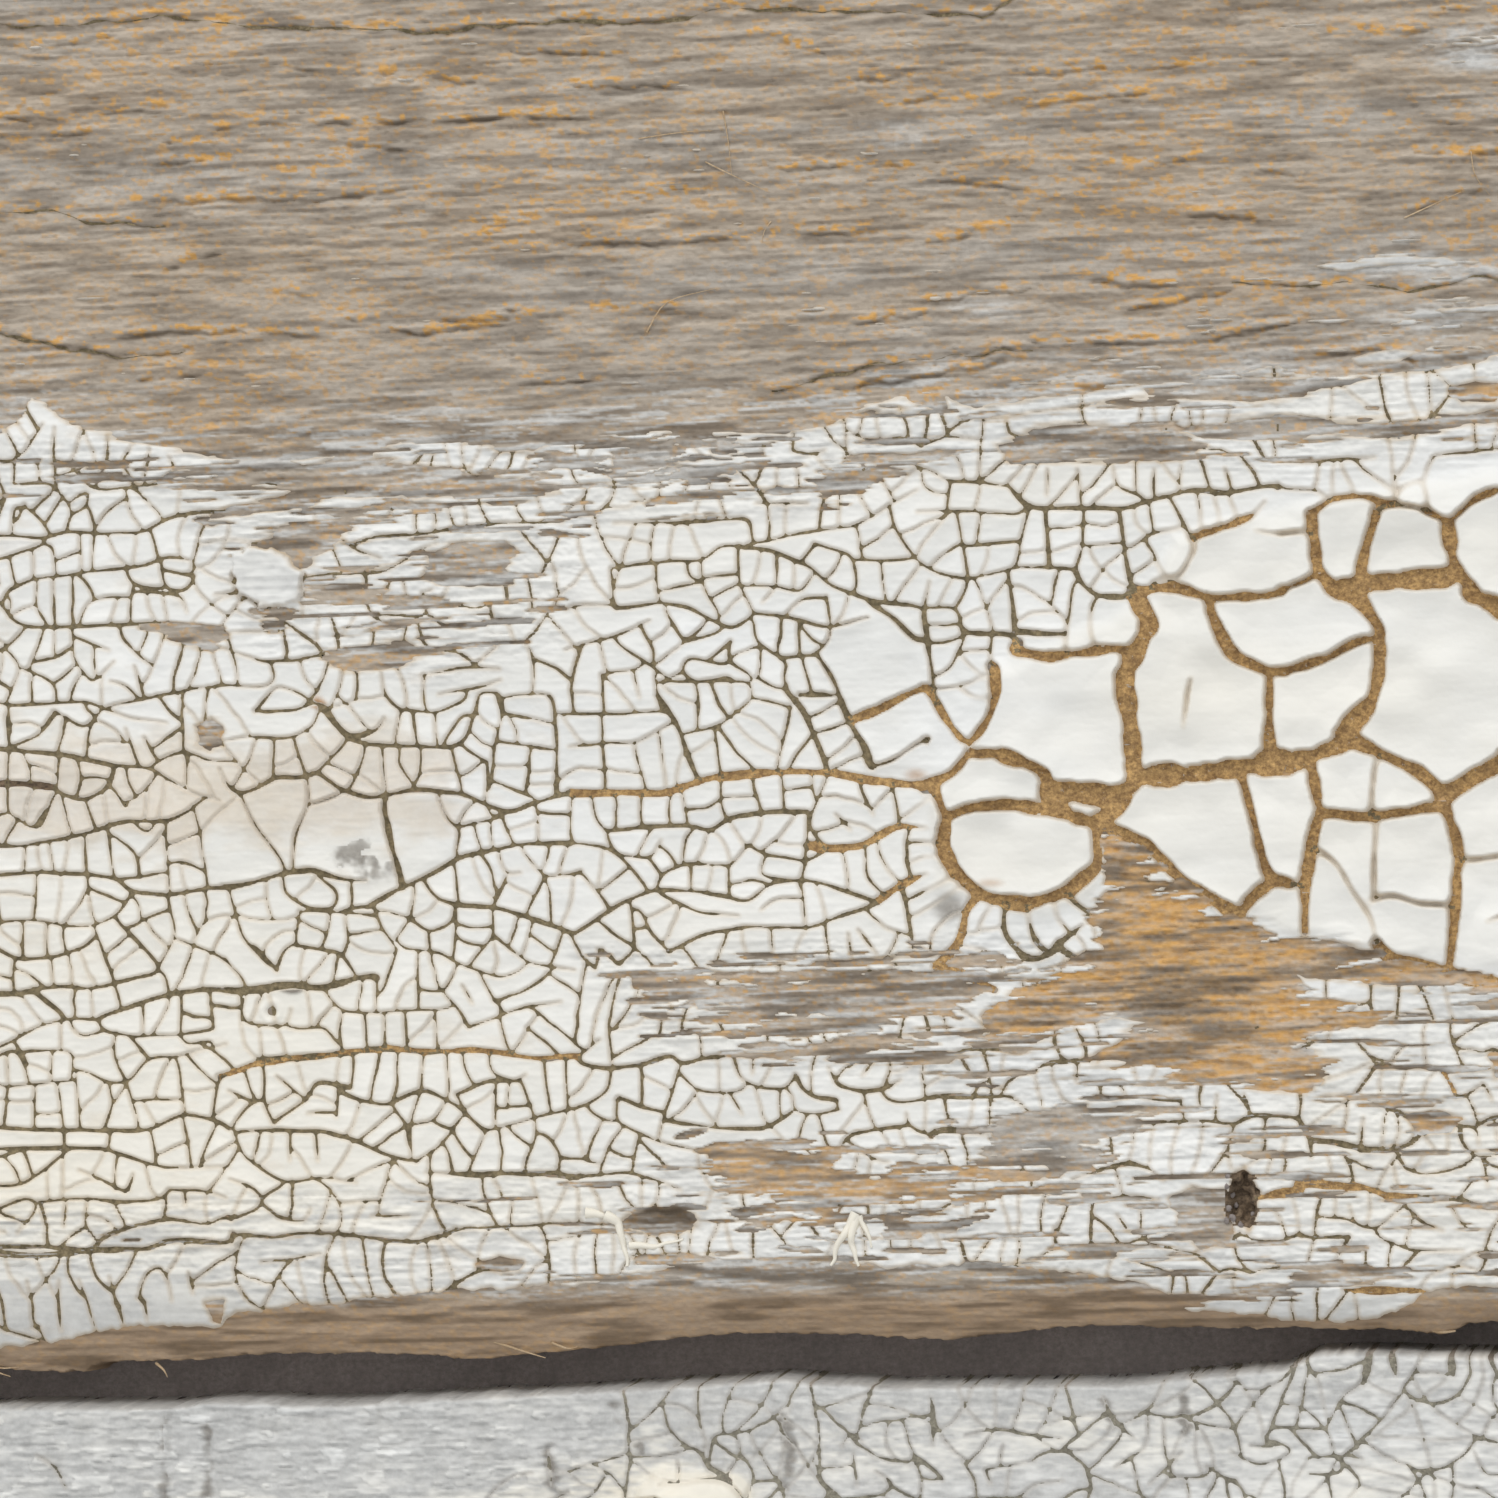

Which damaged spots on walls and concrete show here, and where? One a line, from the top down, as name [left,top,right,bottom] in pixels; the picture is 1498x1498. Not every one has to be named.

peeling [0,0,1498,1099]
peeling [694,1095,1161,1242]